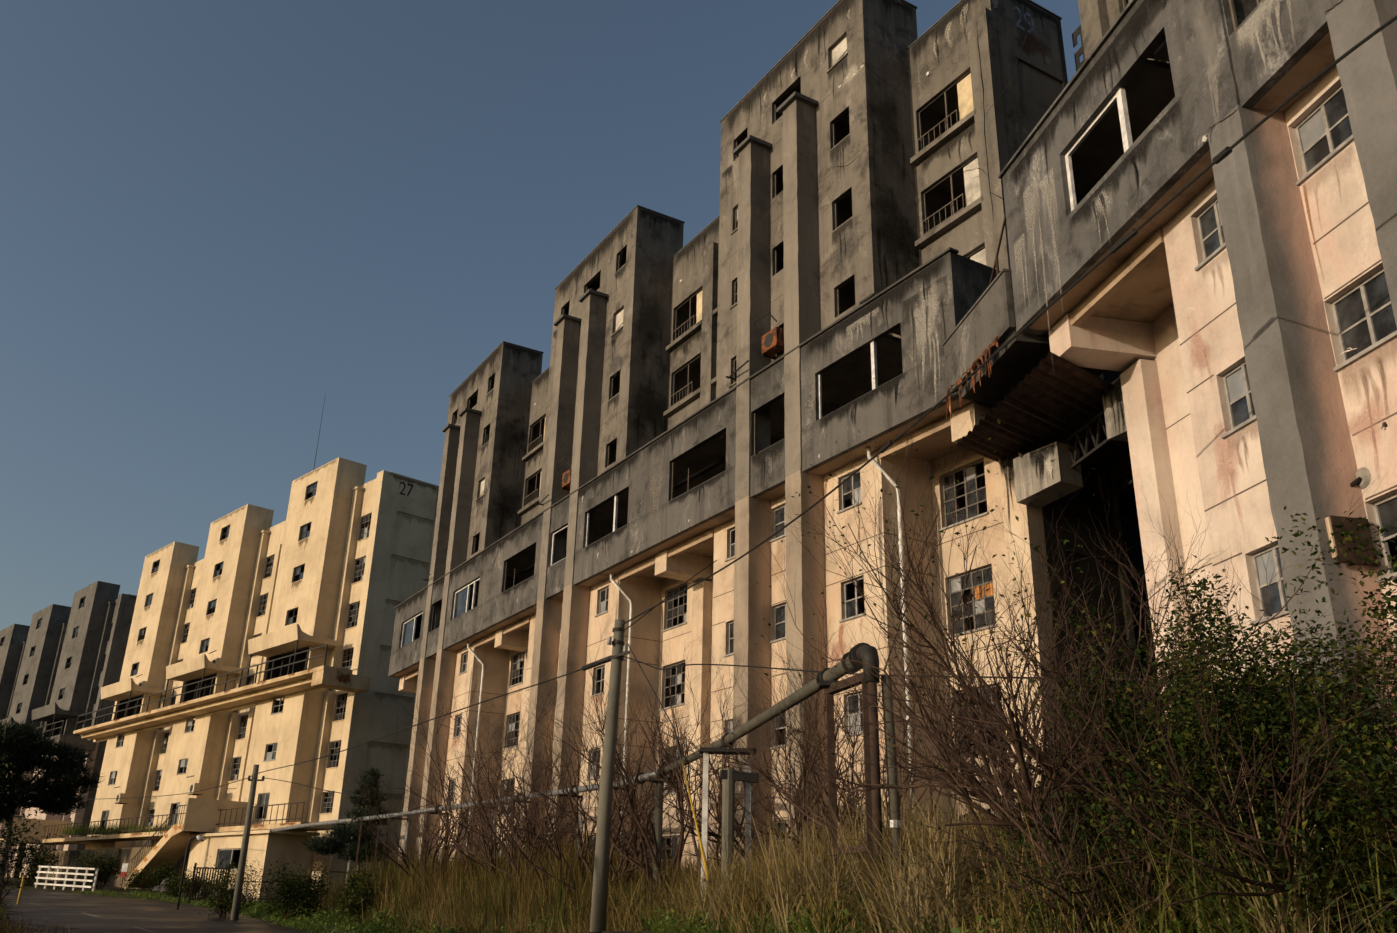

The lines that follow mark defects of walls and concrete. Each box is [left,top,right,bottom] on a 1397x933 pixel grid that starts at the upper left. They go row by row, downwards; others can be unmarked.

damp [1238,0,1282,63]
damp [1072,101,1179,222]
damp [809,193,946,426]